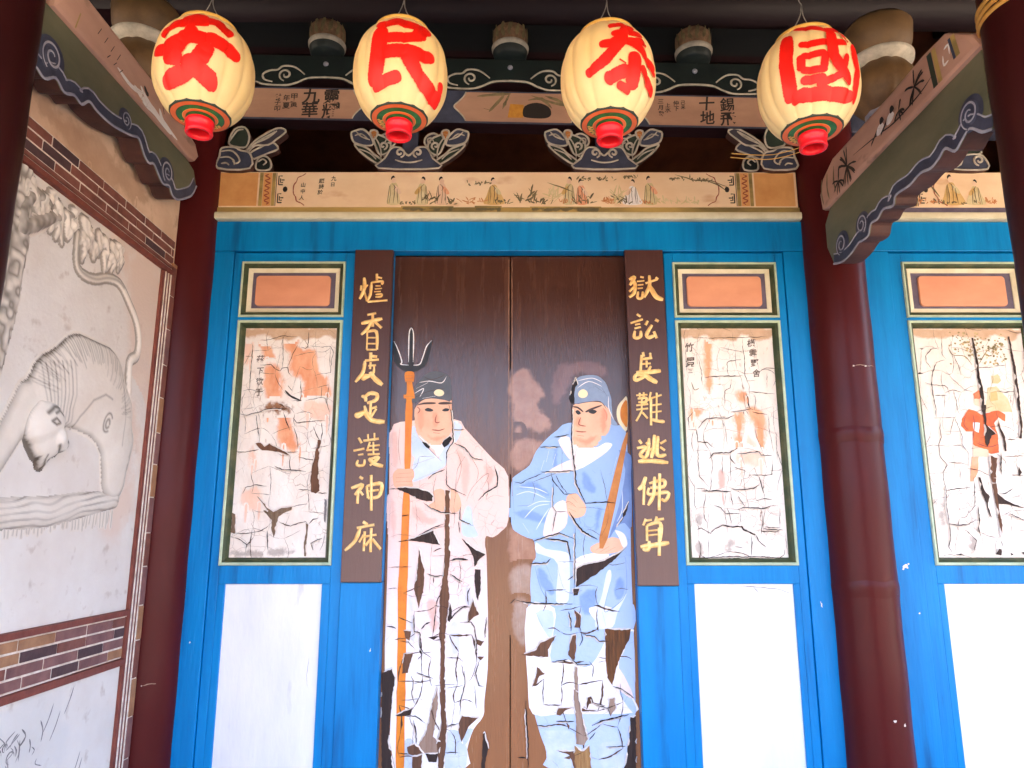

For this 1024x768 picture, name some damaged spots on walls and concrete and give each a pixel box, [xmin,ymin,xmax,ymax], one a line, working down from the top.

peeling [236,416,327,556]
crack [233,329,334,558]
crack [684,328,789,558]
crack [918,328,1024,557]
peeling [972,336,1024,556]